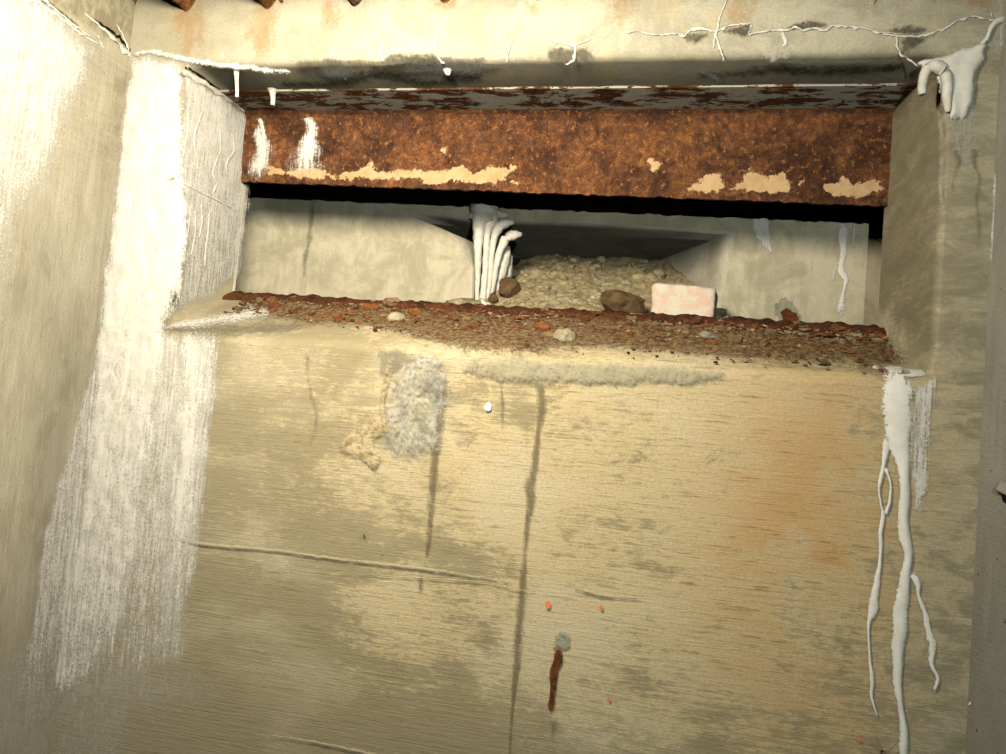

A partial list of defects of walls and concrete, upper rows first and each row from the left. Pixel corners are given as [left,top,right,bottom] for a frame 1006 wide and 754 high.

crack [31,0,131,56]
leakage [790,22,823,30]
crack [627,0,995,66]
leakage [701,25,925,84]
leakage [919,17,1004,120]
leakage [0,0,94,273]
leakage [832,221,860,314]
corrosion [780,308,799,321]
leakage [20,49,496,717]
leakage [509,386,544,753]
leakage [867,368,940,754]
corrosion [548,648,563,711]